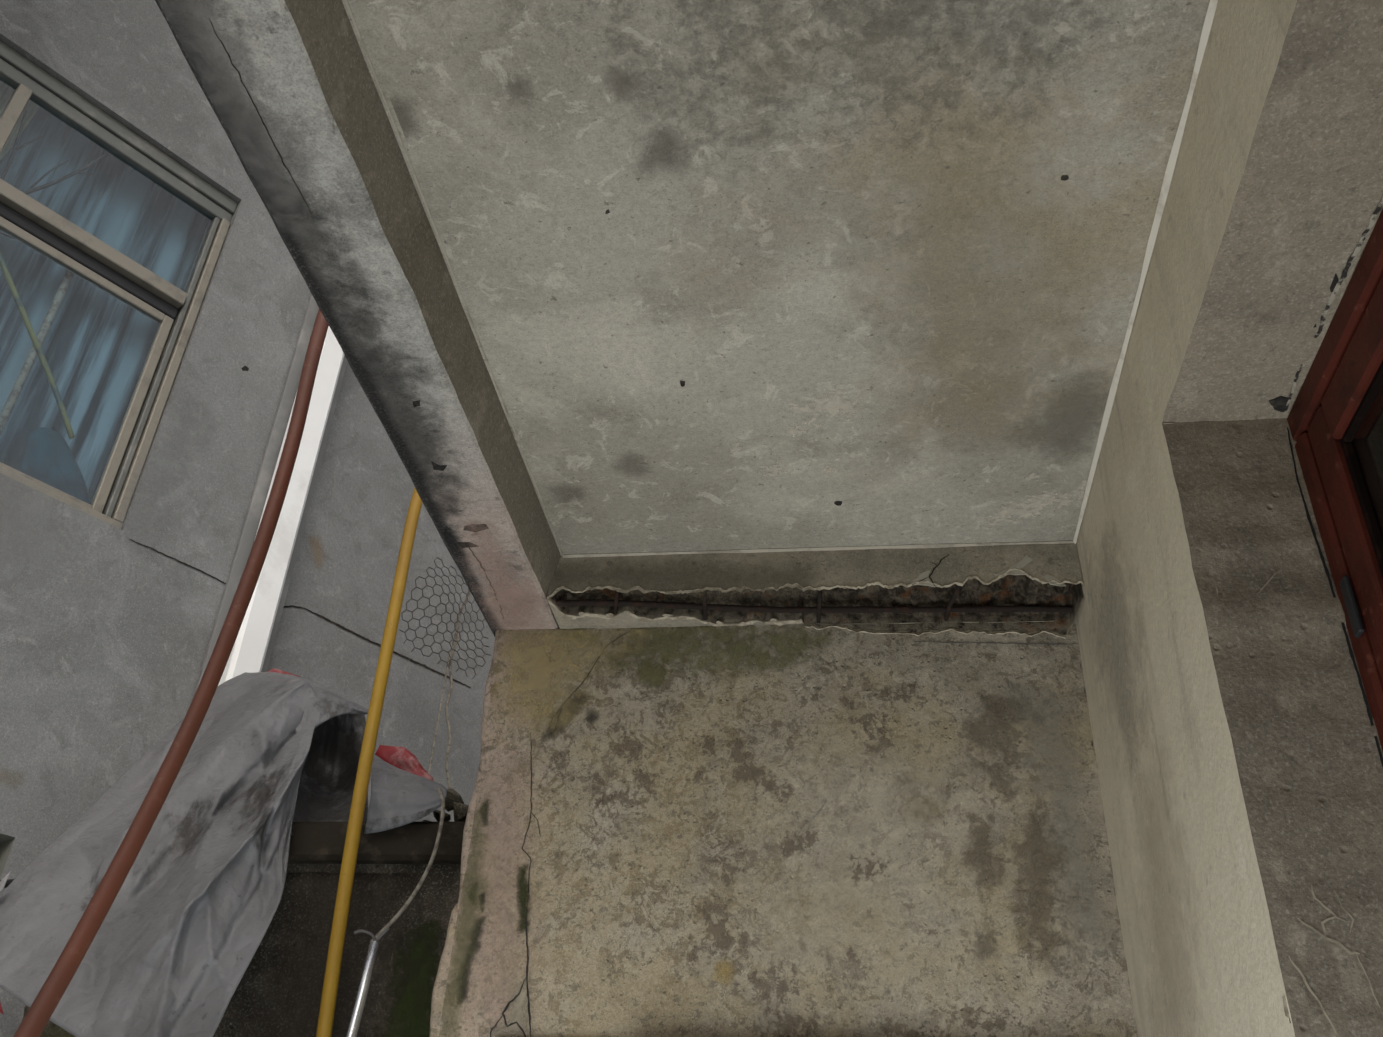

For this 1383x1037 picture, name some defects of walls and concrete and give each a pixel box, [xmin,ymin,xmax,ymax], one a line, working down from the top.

crack [129,539,226,584]
crack [468,546,504,620]
spalling [547,555,1084,639]
crack [284,605,471,688]
damp [497,630,600,738]
crack [490,628,634,1037]
damp [965,814,1067,960]